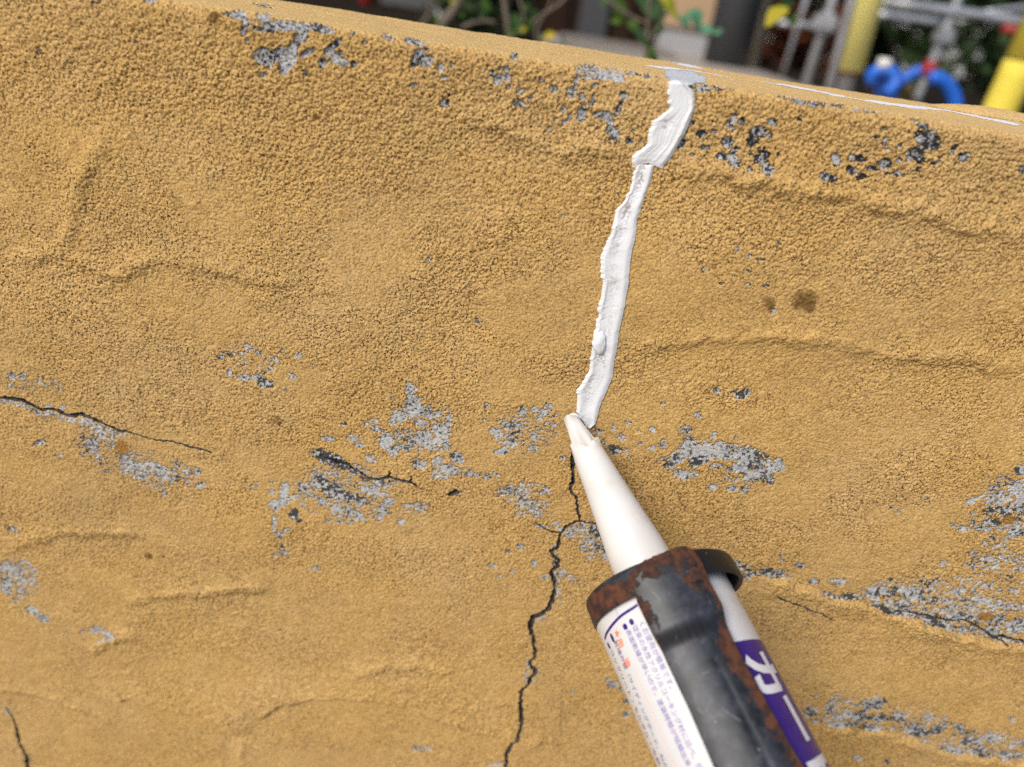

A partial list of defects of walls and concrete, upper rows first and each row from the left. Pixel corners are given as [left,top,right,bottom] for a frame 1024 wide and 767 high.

peeling [223,4,368,78]
peeling [677,114,780,177]
peeling [819,118,970,183]
crack [0,396,212,454]
peeling [76,423,206,497]
crack [321,455,463,496]
peeling [249,382,557,559]
peeling [592,412,785,493]
peeling [807,465,1024,645]
crack [504,452,596,767]
crack [4,708,31,767]
peeling [799,693,1024,761]